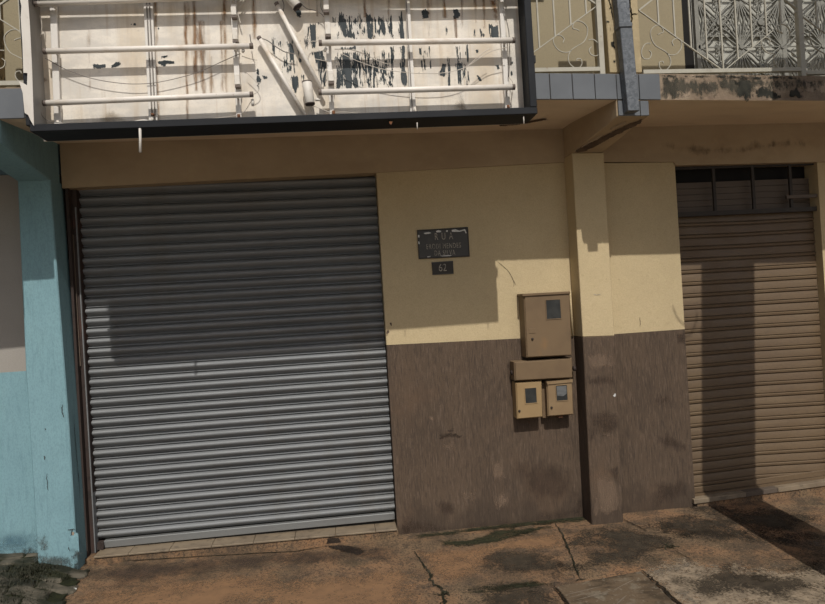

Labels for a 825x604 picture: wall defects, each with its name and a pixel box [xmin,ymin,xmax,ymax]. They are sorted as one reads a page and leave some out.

water stain [662,75,822,102]
crack [555,523,587,581]